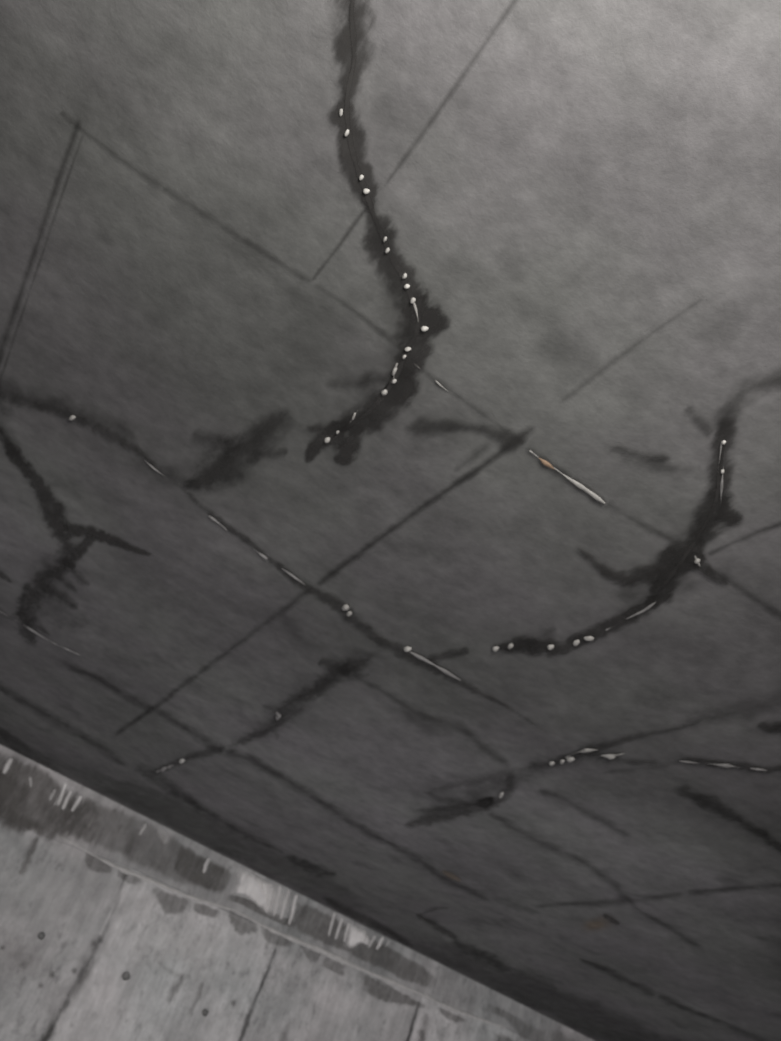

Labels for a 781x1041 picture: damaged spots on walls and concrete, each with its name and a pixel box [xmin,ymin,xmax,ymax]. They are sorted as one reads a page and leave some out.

crack [306,0,448,465]
crack [12,397,84,422]
crack [0,429,151,641]
crack [492,408,743,656]
crack [188,494,506,742]
crack [759,723,781,733]
crack [156,752,207,772]
crack [680,759,781,773]
damp [0,759,82,841]
damp [682,788,781,851]
damp [236,872,297,924]
damp [328,901,410,949]